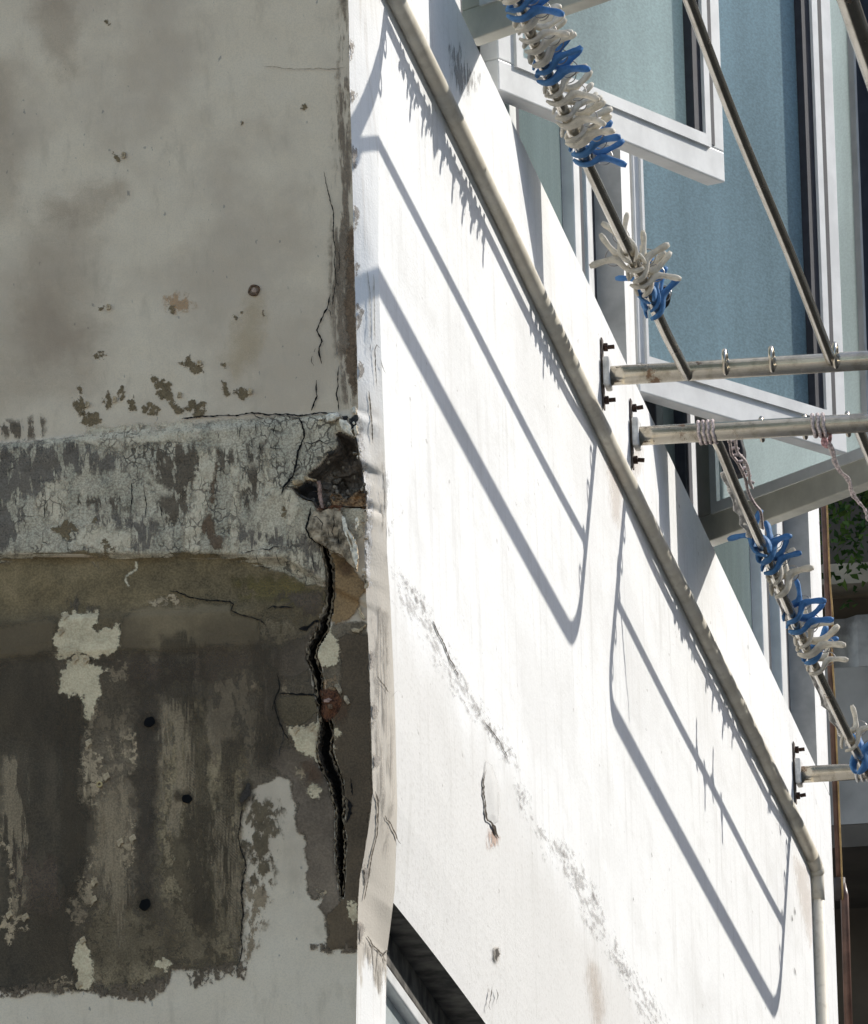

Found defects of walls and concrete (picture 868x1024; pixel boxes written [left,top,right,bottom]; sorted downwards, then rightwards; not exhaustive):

crack [182,173,340,496]
damp [0,443,199,586]
peeling [0,205,374,680]
damp [216,444,263,510]
crack [172,508,401,900]
flaking render [276,695,317,731]
flaking render [267,746,342,944]